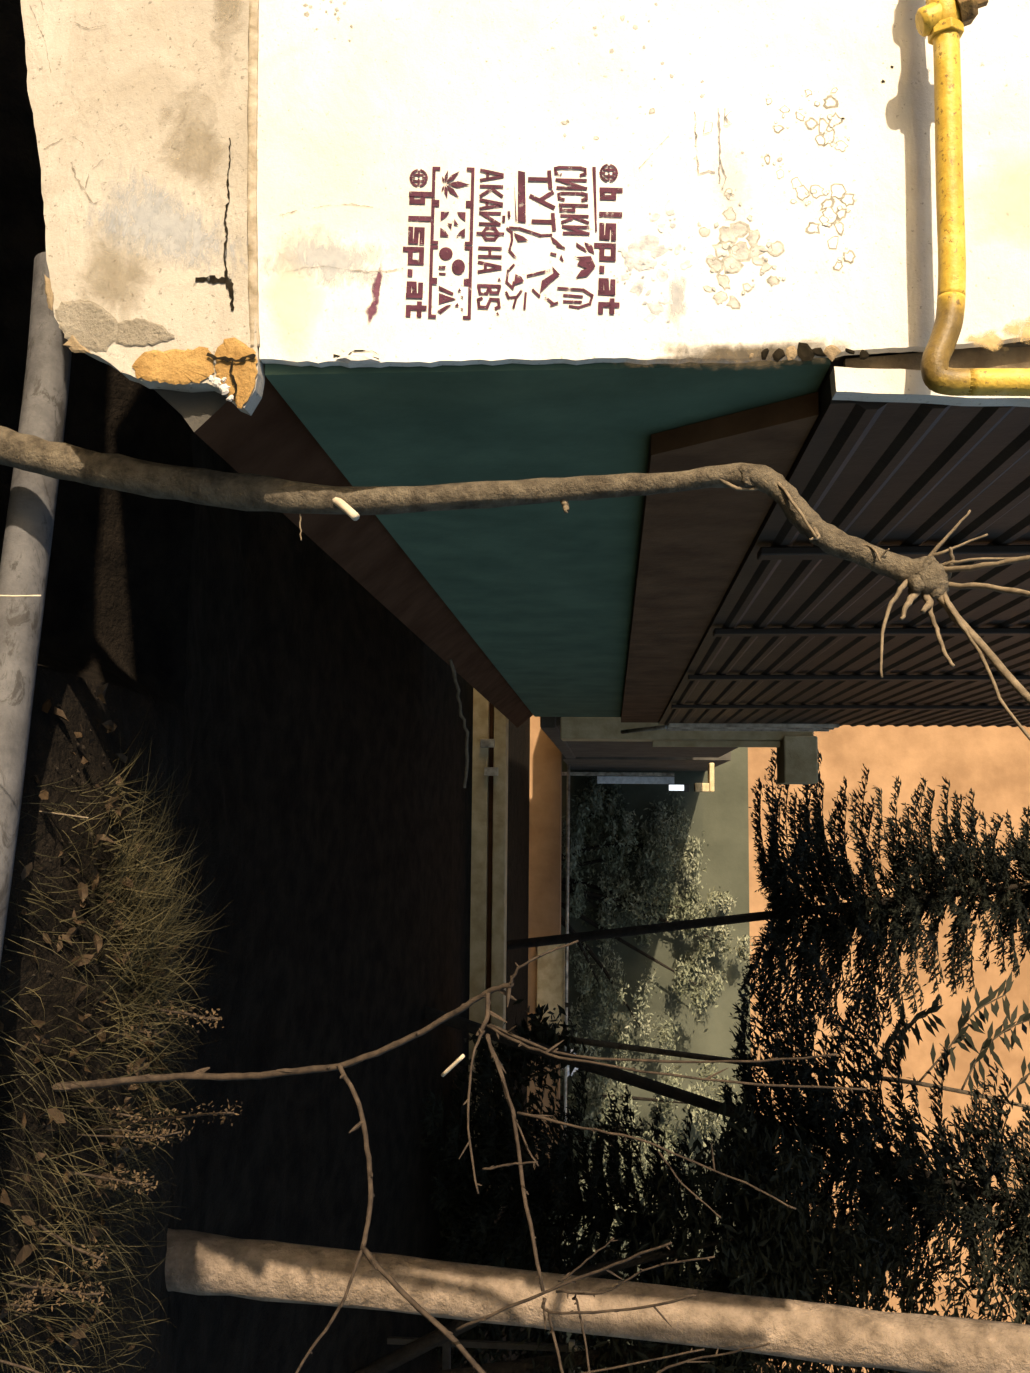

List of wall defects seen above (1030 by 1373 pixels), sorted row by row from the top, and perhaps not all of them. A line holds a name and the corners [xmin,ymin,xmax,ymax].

crack [195,138,234,311]
spalling [44,274,258,409]